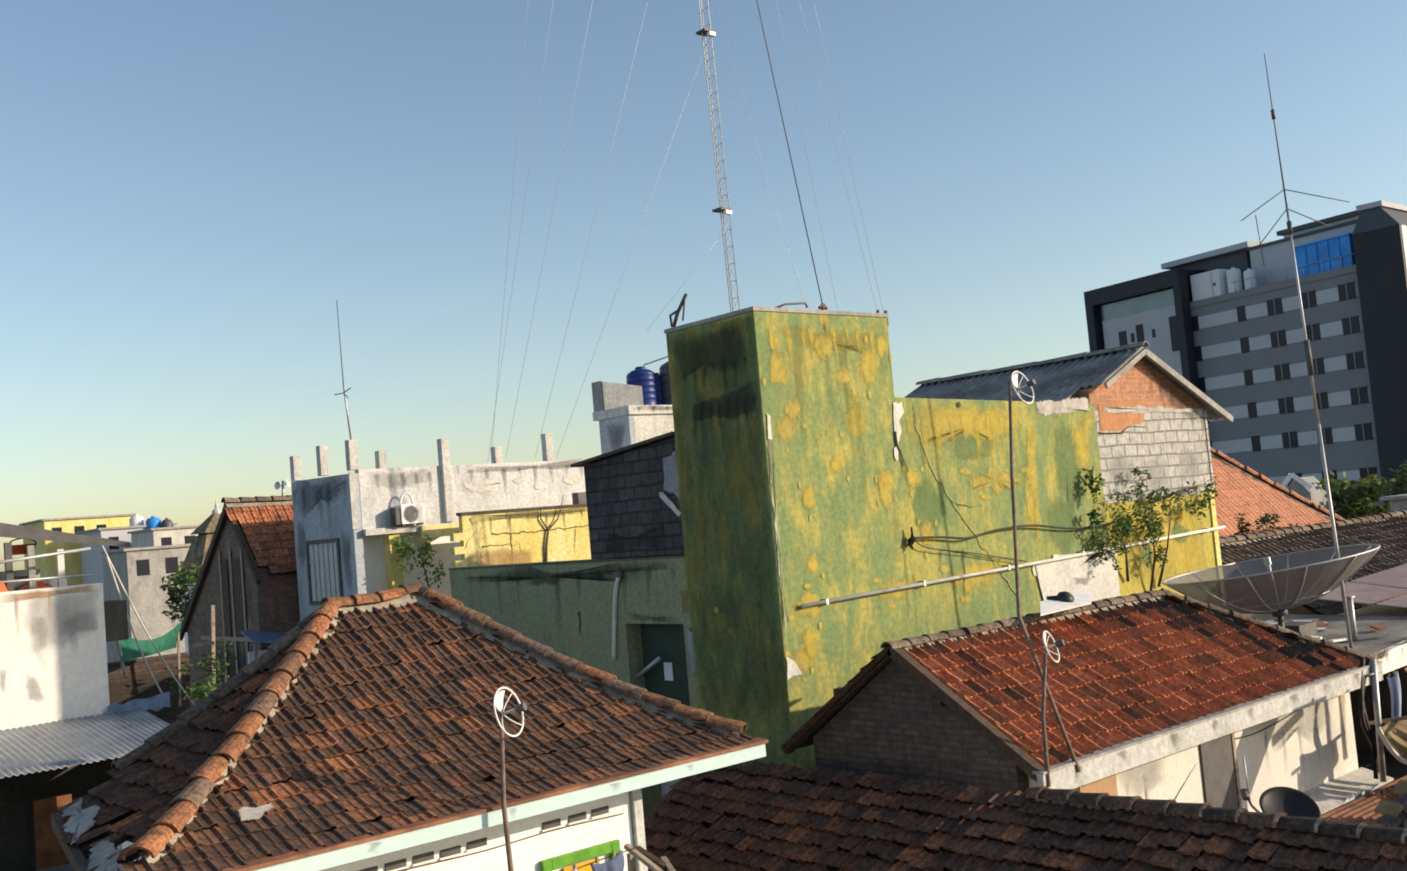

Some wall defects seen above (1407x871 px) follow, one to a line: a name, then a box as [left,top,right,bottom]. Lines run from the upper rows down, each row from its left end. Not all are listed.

peeling [875,397,1146,603]
peeling [873,574,920,608]
spalling [61,797,123,871]